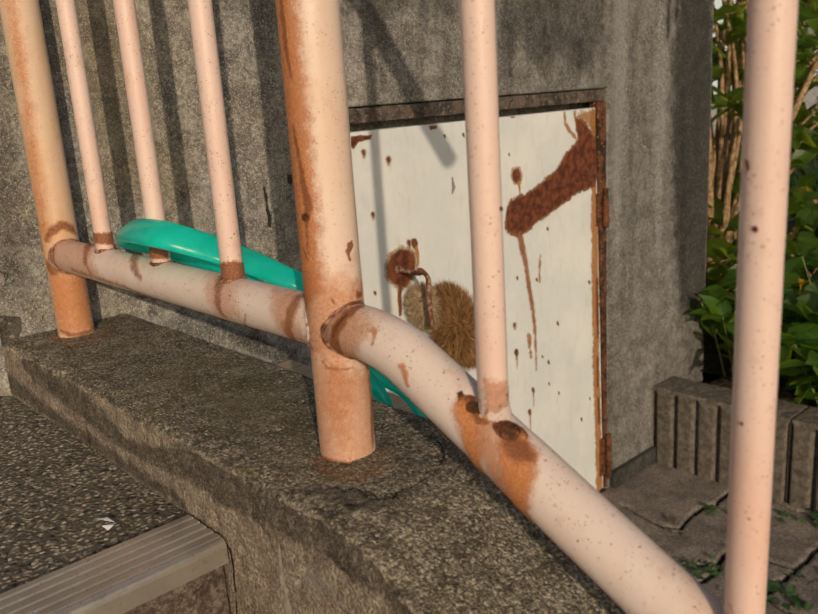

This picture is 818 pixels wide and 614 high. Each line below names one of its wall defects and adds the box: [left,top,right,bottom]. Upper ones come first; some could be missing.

corrosion [275,0,320,342]
corrosion [351,135,372,156]
corrosion [43,221,114,336]
corrosion [329,291,364,381]
corrosion [385,238,419,316]
corrosion [500,108,603,491]